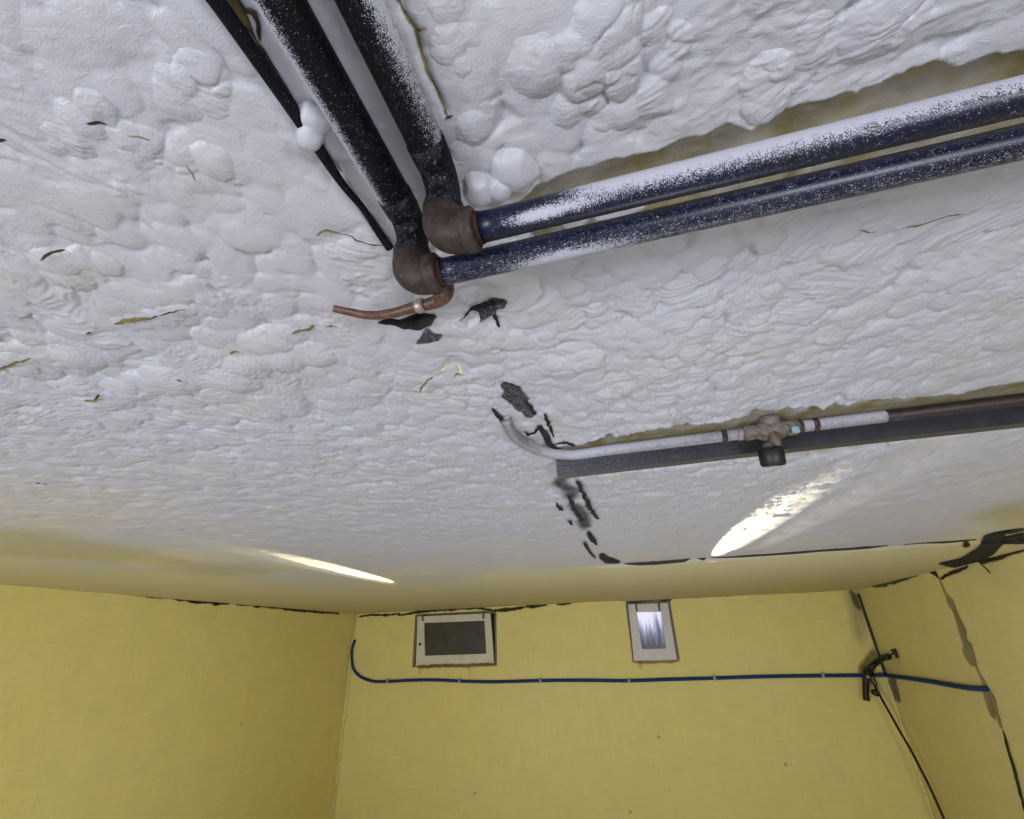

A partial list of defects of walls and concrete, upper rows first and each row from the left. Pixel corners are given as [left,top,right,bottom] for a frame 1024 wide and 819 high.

peeling [416,329,442,344]
crack [554,478,1024,580]
crack [989,690,1024,811]